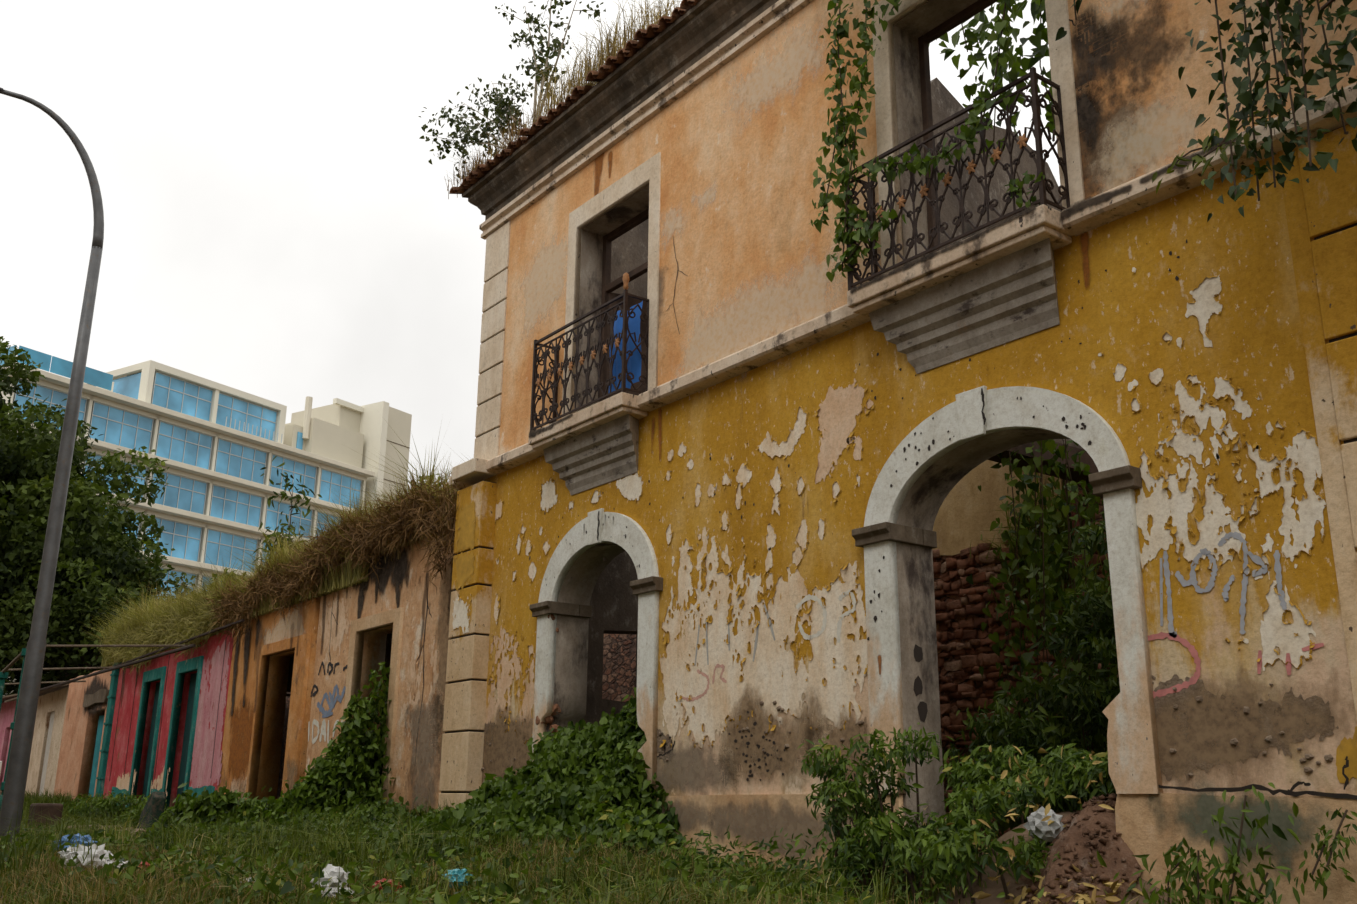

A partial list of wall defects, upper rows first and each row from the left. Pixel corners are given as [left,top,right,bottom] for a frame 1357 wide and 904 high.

crack [668,236,687,334]
peeling [1162,331,1184,348]
leakage [231,618,262,716]
leakage [321,543,410,654]
leakage [405,554,455,812]
peeling [481,593,562,776]
peeling [512,477,579,585]
peeling [591,363,882,781]
peeling [1113,362,1357,783]
leakage [650,692,868,859]